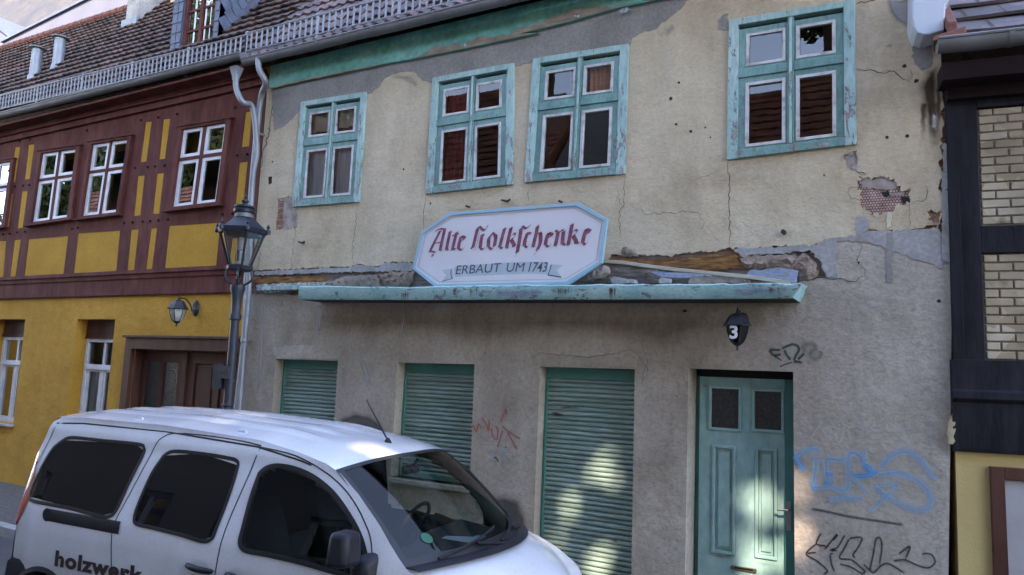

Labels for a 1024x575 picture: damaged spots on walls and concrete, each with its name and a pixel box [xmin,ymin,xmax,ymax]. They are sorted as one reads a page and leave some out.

peeling [413,0,651,59]
flaking render [274,196,297,231]
crack [617,163,731,253]
flaking render [842,151,911,233]
flaking render [927,208,940,226]
flaking render [326,271,416,287]
flaking render [740,253,819,281]